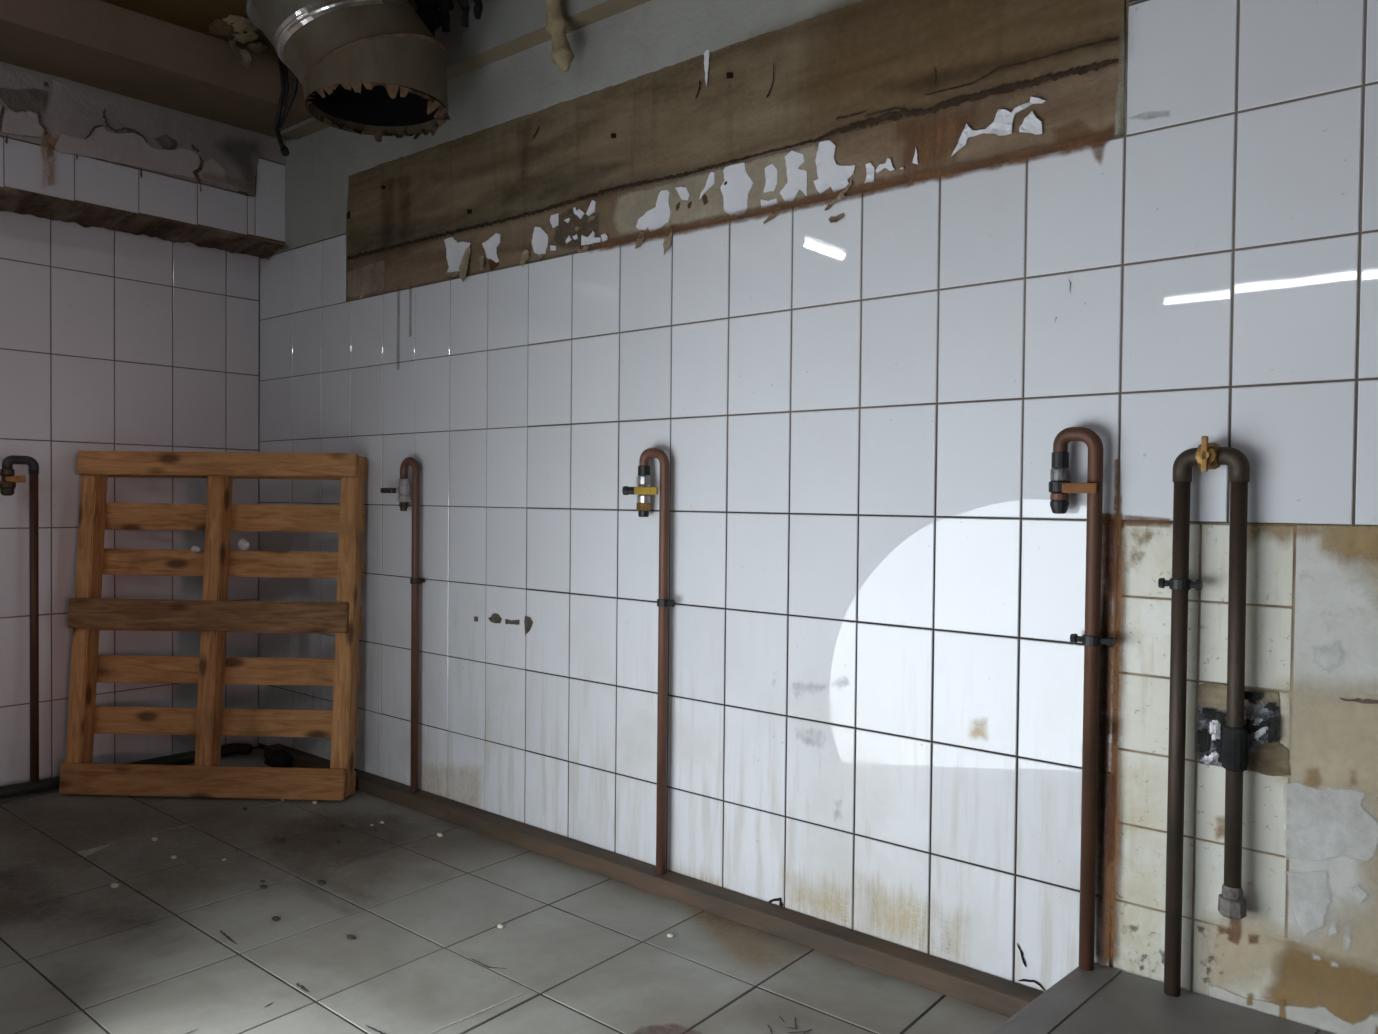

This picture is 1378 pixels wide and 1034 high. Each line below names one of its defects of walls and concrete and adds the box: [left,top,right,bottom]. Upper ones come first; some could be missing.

peeling [0,88,239,191]
rust [1095,460,1169,963]
spalling [1196,682,1227,767]
peeling [1244,688,1378,949]